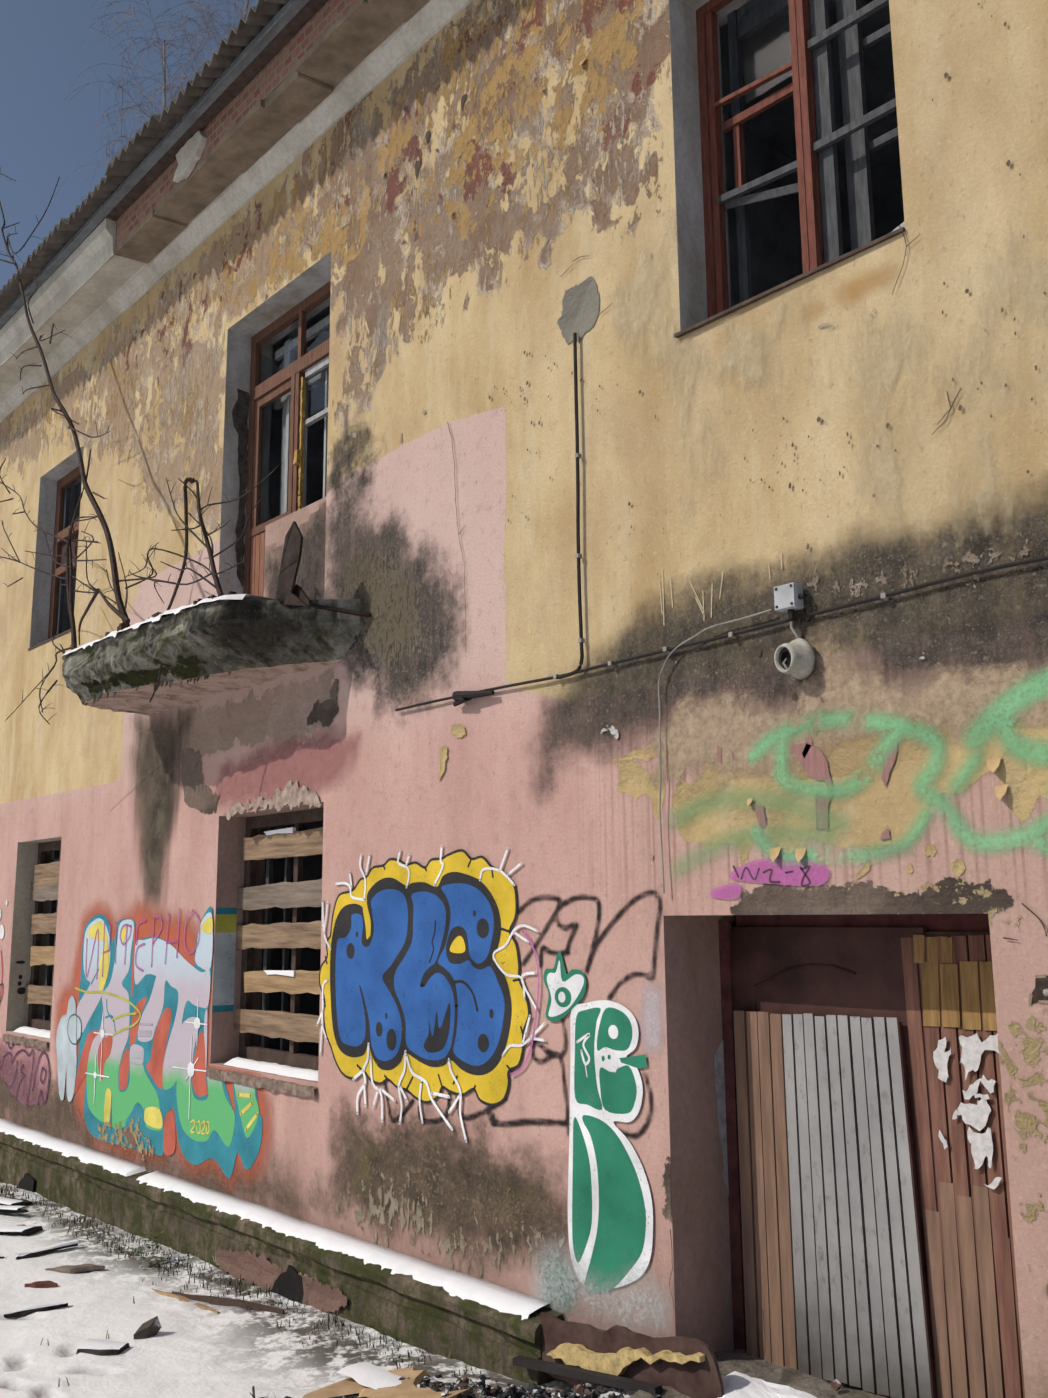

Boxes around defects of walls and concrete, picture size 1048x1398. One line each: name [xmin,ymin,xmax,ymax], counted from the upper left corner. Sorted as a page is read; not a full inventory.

peeling [0,0,672,588]
water stain [77,654,204,700]
water stain [136,717,189,898]
spalling [180,747,321,820]
mould [202,429,457,708]
crack [447,422,466,637]
water stain [541,436,1048,787]
peeling [604,714,1048,927]
water stain [332,1115,568,1278]